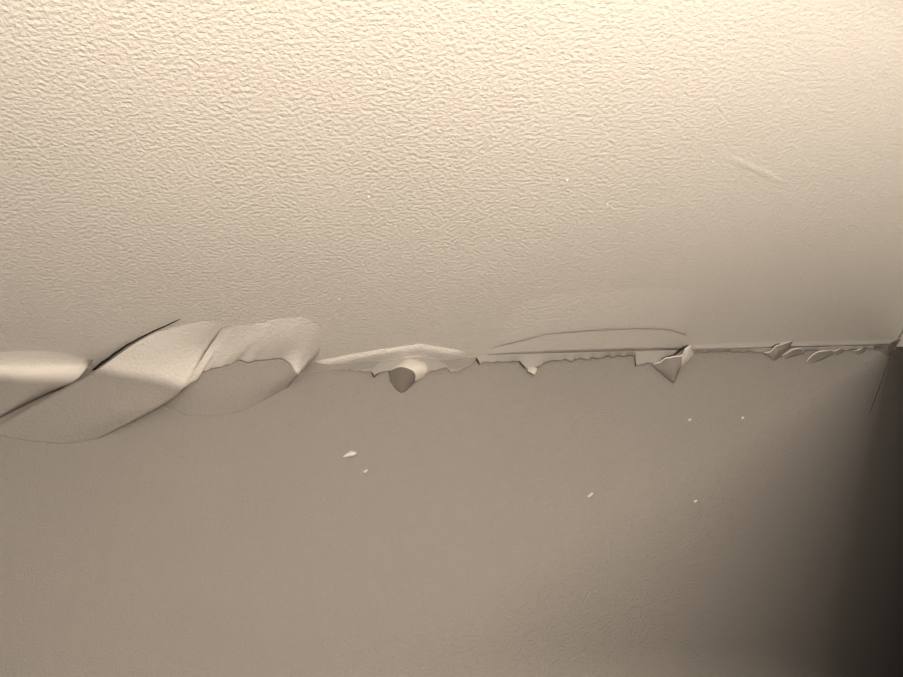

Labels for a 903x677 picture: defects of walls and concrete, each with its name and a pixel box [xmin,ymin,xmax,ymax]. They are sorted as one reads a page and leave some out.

peeling [389,359,428,393]
peeling [653,338,900,383]